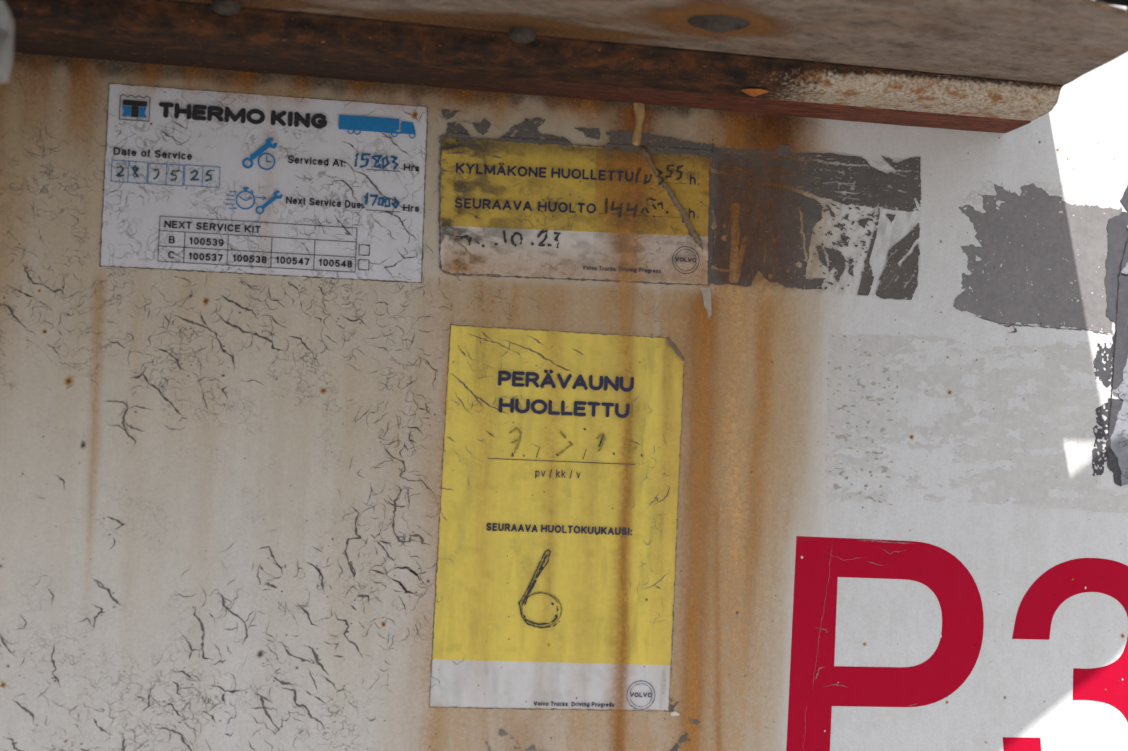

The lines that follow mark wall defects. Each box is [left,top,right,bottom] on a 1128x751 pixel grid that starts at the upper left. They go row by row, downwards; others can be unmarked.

corrosion [604,106,655,381]
peeling [816,205,920,300]
crack [0,64,584,751]
crack [626,357,685,625]